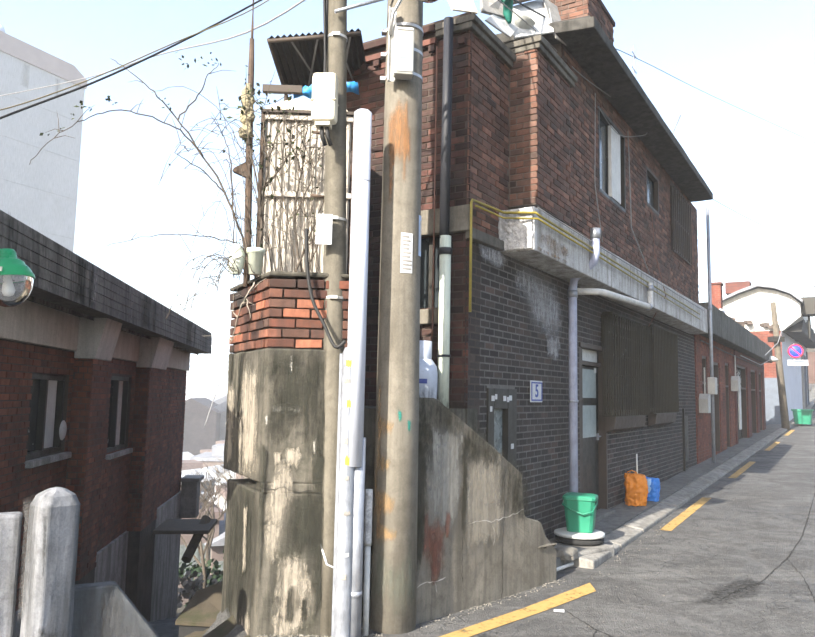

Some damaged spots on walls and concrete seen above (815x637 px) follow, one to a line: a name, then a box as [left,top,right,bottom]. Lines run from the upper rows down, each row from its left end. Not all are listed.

corrosion [389,104,410,194]
efflorescence [482,247,506,265]
efflorescence [516,269,560,360]
damp [229,352,243,415]
damp [226,445,266,612]
damp [266,353,325,622]
crack [417,472,523,593]